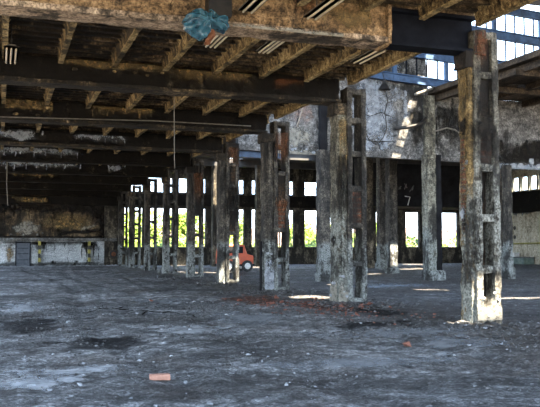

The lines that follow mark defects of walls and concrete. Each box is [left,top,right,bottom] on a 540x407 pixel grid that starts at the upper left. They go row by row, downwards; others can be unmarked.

leakage [0,130,78,178]
leakage [12,196,47,218]
leakage [44,207,87,237]